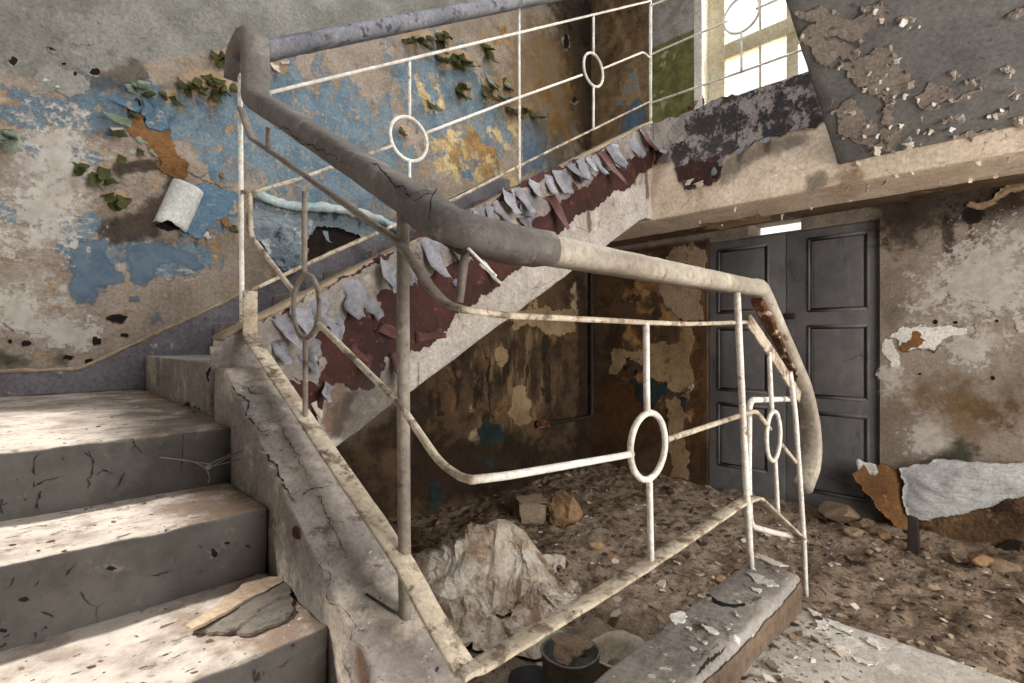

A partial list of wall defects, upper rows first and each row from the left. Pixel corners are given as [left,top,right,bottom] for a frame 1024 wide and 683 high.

peeling [68,47,239,304]
peeling [402,0,1024,235]
peeling [258,250,397,422]
peeling [410,231,522,353]
water stain [410,280,591,506]
flaking render [609,284,704,480]
corrosion [751,297,798,381]
spalling [881,319,967,367]
crack [32,454,59,509]
crack [231,382,363,677]
peeling [669,553,790,666]
spalling [918,496,1024,553]